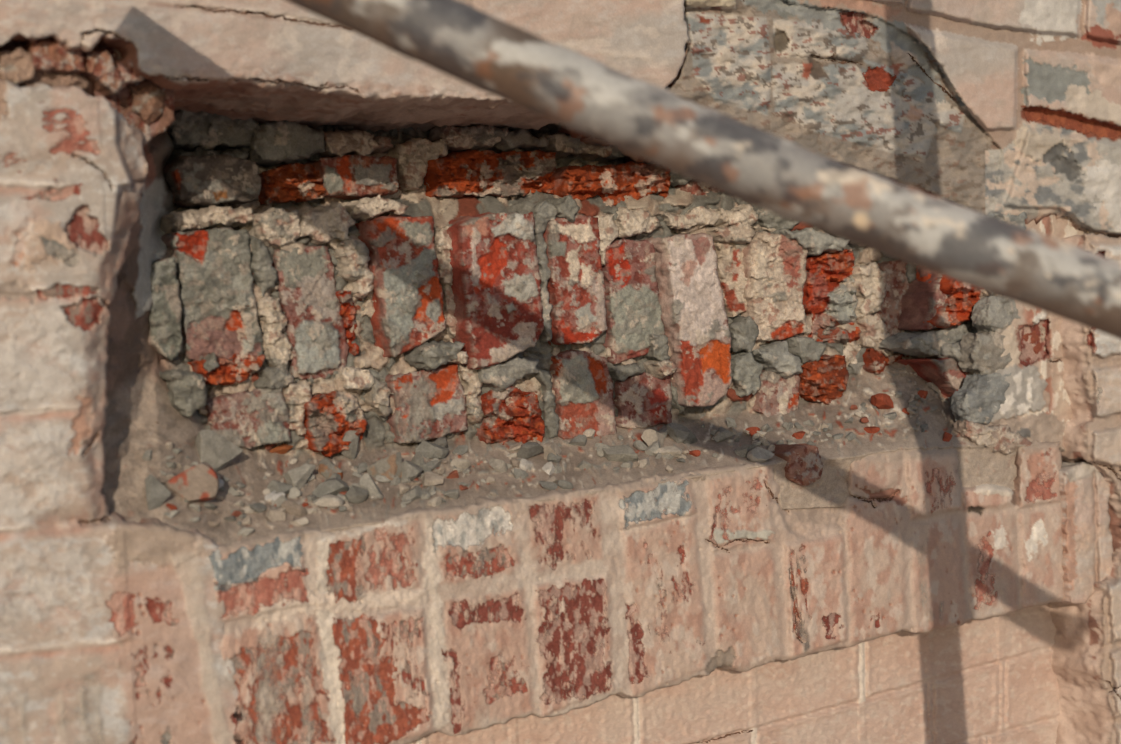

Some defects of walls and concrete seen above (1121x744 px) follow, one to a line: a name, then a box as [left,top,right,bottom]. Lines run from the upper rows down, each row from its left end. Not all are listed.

crack [80,29,125,45]
spalling [839,11,880,39]
spalling [0,39,1057,618]
peeling [106,592,179,636]
peeling [134,643,175,706]
peeling [230,614,432,744]
peeling [441,648,465,734]
peeling [449,592,523,630]
peeling [483,578,612,705]
peeling [625,546,693,684]
peeling [789,545,844,639]